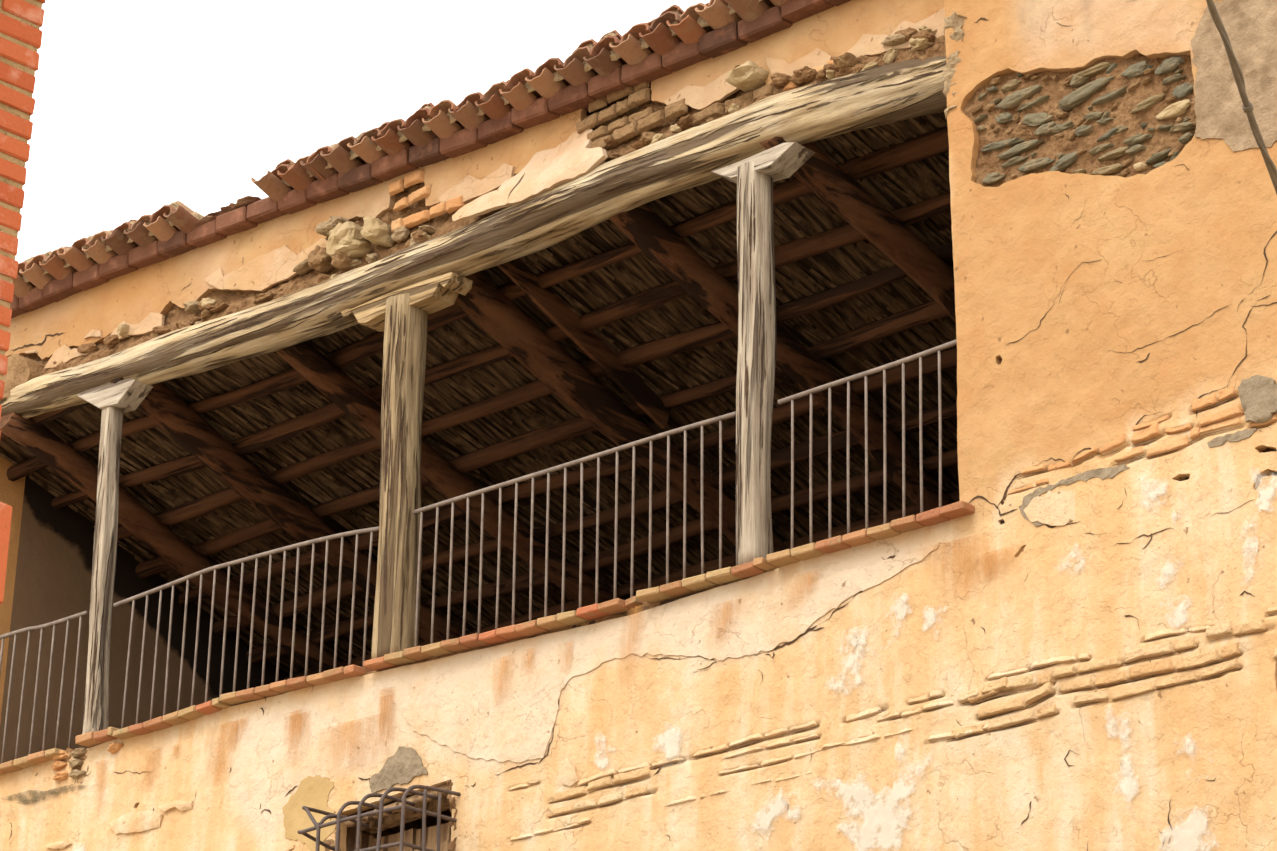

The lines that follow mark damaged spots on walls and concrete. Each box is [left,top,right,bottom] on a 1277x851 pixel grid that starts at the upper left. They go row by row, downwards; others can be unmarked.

flaking render [576,7,945,162]
flaking render [963,54,1196,187]
flaking render [24,163,515,369]
crack [1107,231,1277,417]
crack [969,448,1097,516]
crack [635,591,863,682]
crack [466,701,559,787]
peeling [595,737,608,768]
peeling [753,793,800,830]